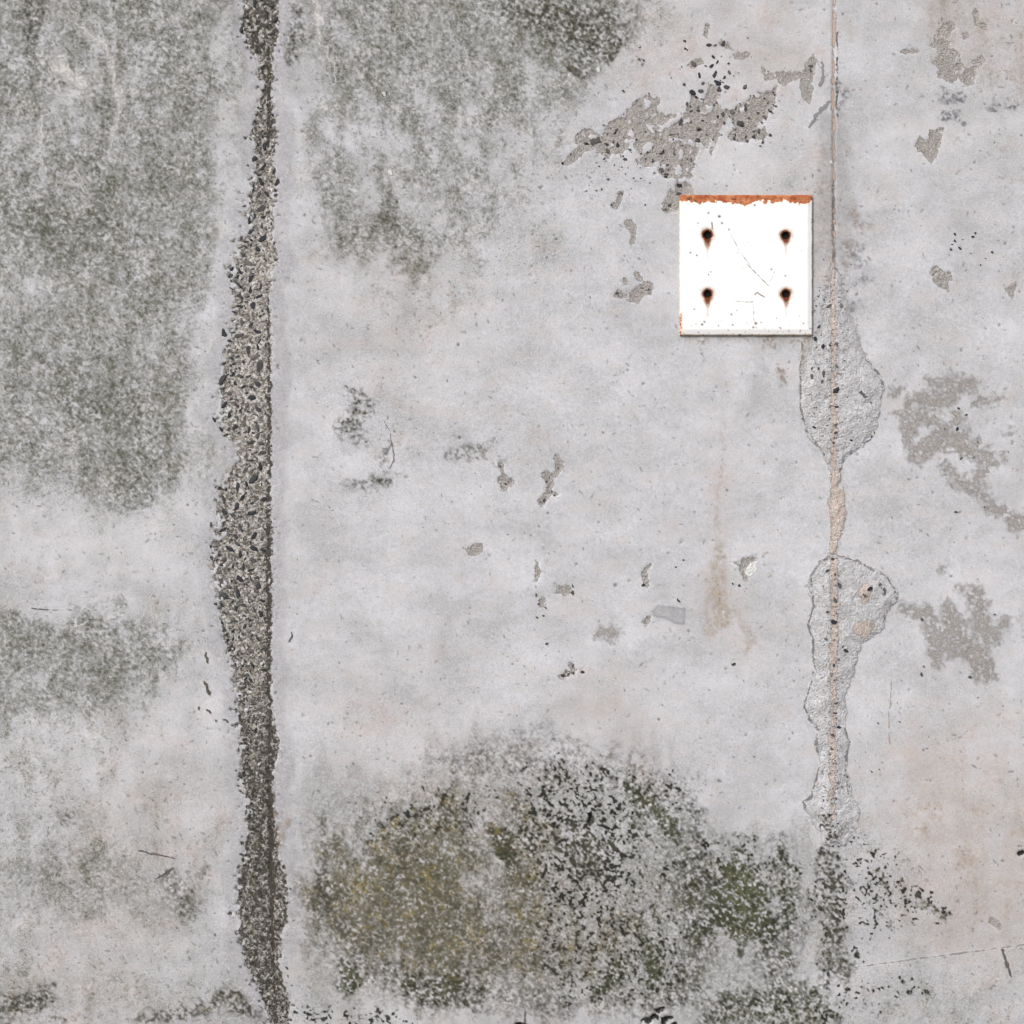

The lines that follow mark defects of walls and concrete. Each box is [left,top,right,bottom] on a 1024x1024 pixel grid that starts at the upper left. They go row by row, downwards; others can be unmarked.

water stain [2,59,88,89]
water stain [67,4,130,151]
water stain [287,0,337,82]
water stain [488,2,622,65]
spalling [561,23,818,214]
crack [808,0,839,262]
spalling [900,8,987,86]
spalling [198,0,296,1024]
spalling [892,377,1024,531]
spalling [901,585,1009,682]
water stain [504,752,650,951]
water stain [803,808,951,1013]